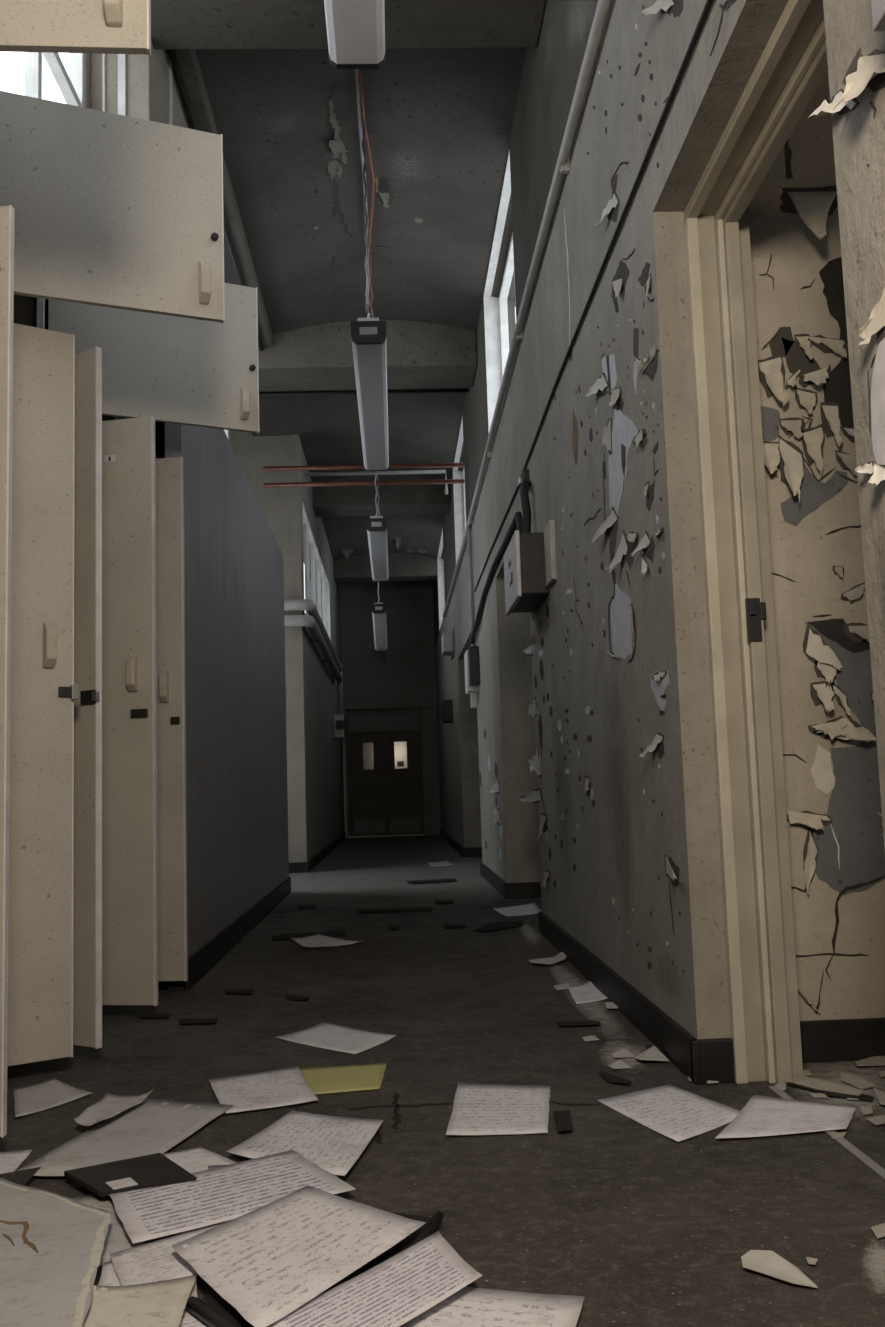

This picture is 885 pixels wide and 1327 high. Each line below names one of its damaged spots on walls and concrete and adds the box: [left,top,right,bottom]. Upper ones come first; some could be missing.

peeling [598,0,683,80]
peeling [808,47,885,118]
peeling [595,161,629,228]
peeling [562,249,665,664]
peeling [758,257,885,526]
peeling [517,602,595,888]
peeling [639,732,665,769]
peeling [650,670,670,715]
peeling [783,618,885,896]
crack [796,876,885,1012]